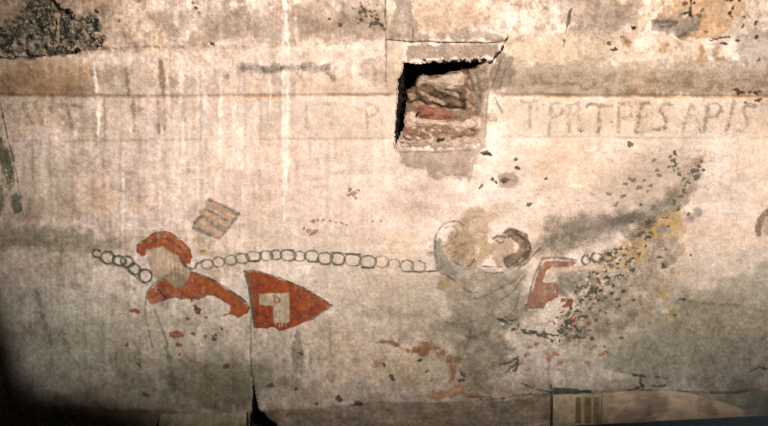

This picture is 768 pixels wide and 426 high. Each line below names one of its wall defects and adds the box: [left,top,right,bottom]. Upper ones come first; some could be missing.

flaking render [0,0,106,60]
damp [92,61,105,148]
damp [148,73,186,227]
damp [201,70,245,200]
damp [261,0,291,219]
spalling [393,37,513,156]
damp [531,194,674,255]
crack [249,353,279,426]